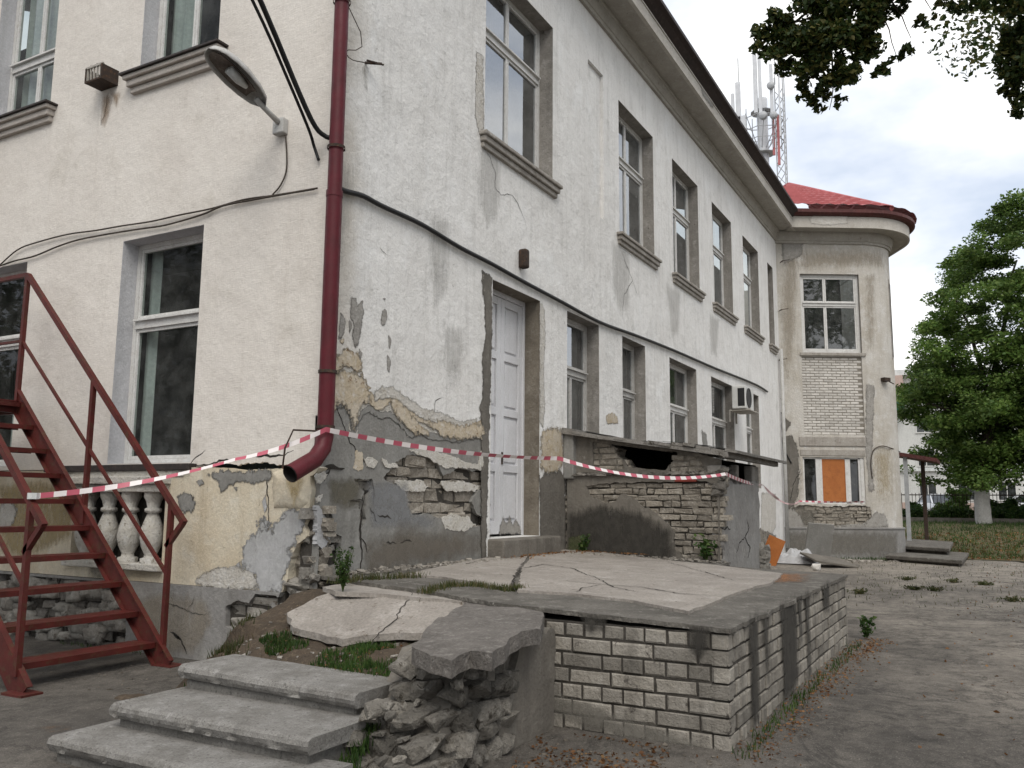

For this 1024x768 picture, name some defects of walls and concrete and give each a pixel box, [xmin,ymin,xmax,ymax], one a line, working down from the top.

flaking render [195,270,521,627]
peeling [177,468,273,514]
water stain [570,506,671,558]
crack [512,562,732,596]
crack [367,593,413,653]